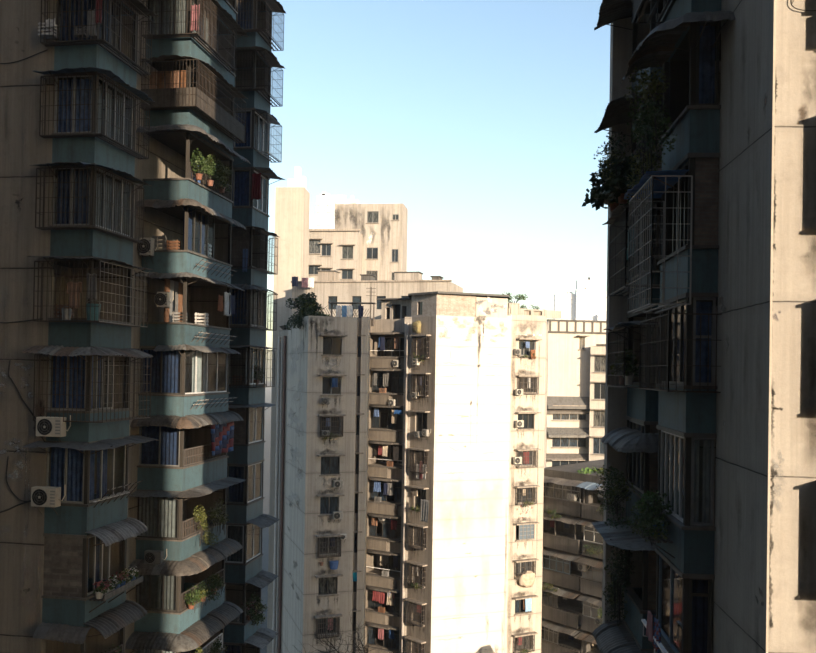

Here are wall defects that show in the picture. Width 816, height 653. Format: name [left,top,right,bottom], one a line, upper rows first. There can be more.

water stain [350,213,390,243]